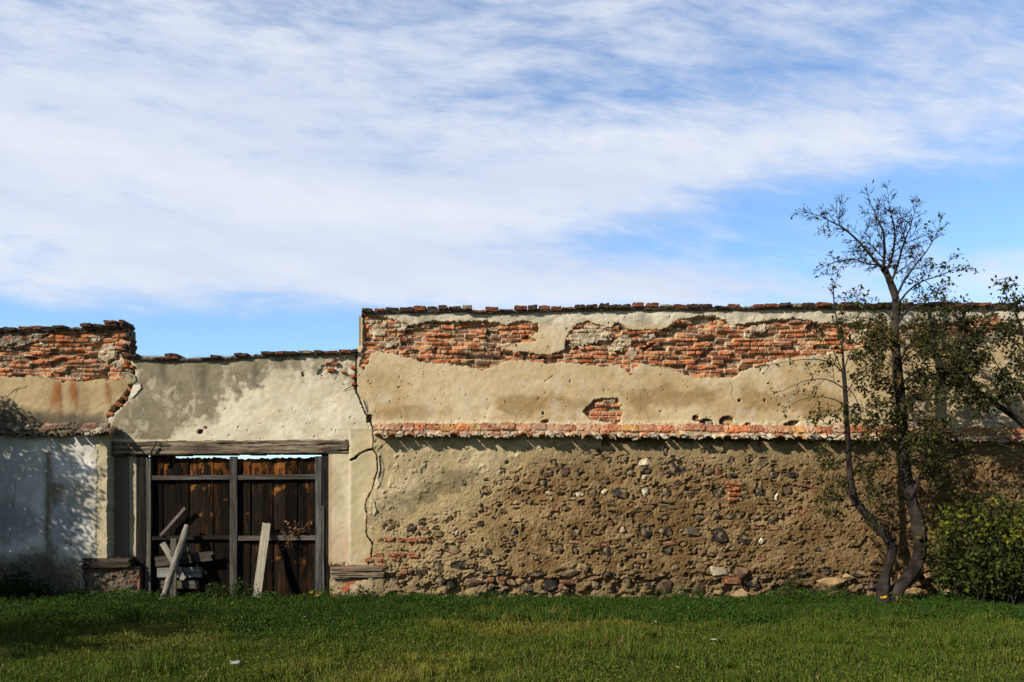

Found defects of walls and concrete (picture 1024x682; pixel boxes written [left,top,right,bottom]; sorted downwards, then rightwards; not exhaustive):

spalling [0,327,135,383]
spalling [317,314,1001,387]
spalling [583,398,623,424]
crack [346,348,384,563]
spalling [365,439,1024,600]